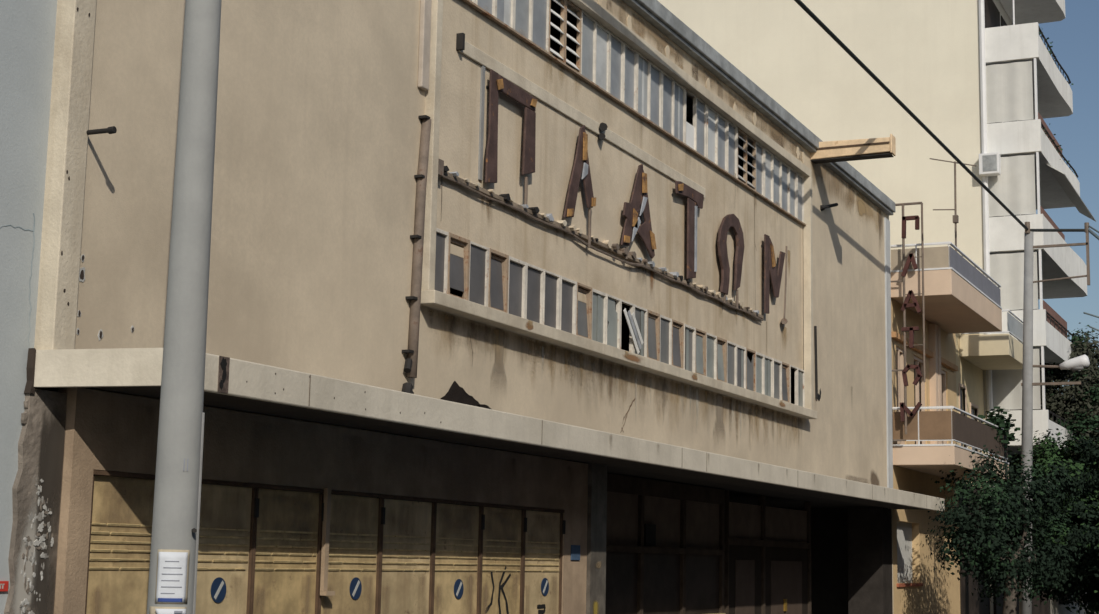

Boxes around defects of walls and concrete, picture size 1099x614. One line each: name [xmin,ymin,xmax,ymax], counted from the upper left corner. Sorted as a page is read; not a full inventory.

water stain [494,329,505,376]
water stain [519,337,623,383]
spalling [21,348,36,424]
water stain [676,384,767,430]
flaking render [13,416,65,614]